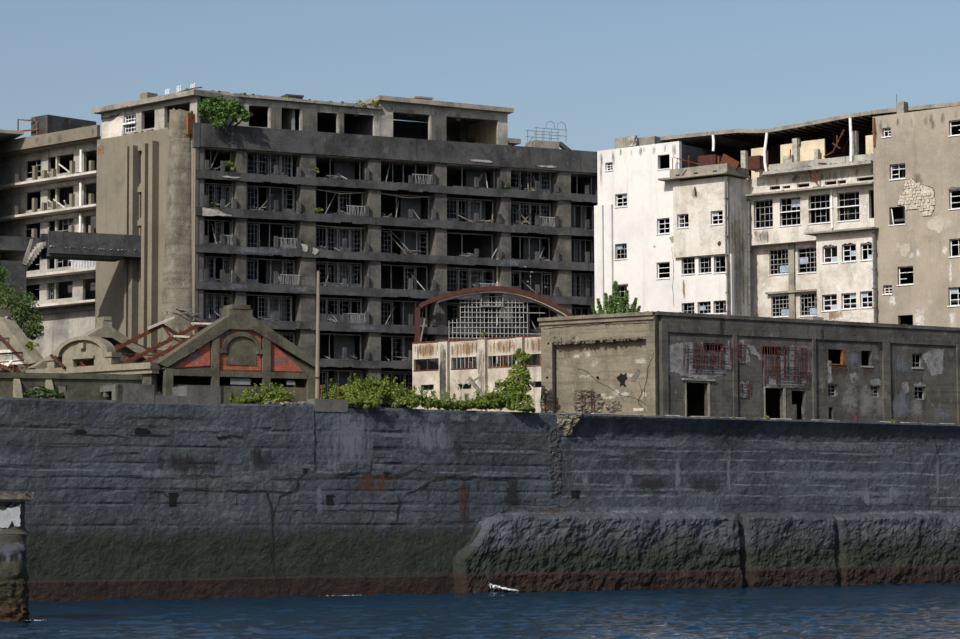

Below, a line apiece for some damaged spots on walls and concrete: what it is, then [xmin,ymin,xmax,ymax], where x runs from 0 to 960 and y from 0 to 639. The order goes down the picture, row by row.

spalling [897,178,944,233]
spalling [668,340,812,398]
spalling [901,349,944,394]
spalling [539,336,646,497]
peeling [0,502,21,528]
crack [63,409,529,576]